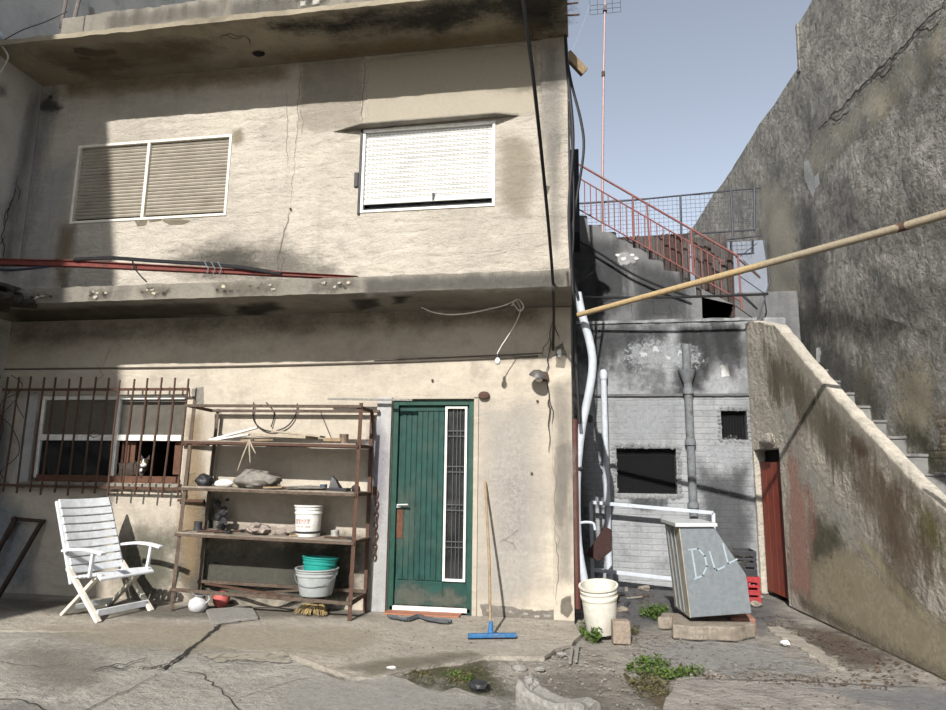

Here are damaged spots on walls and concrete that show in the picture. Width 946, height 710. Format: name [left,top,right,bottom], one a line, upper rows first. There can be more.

water stain [271,0,568,50]
crack [816,0,946,132]
crack [0,175,21,267]
peeling [804,160,820,197]
water stain [638,267,684,317]
water stain [677,326,739,392]
water stain [799,307,904,407]
water stain [763,348,933,595]
flaking render [787,447,946,677]
crack [87,621,323,710]
water stain [796,600,889,667]